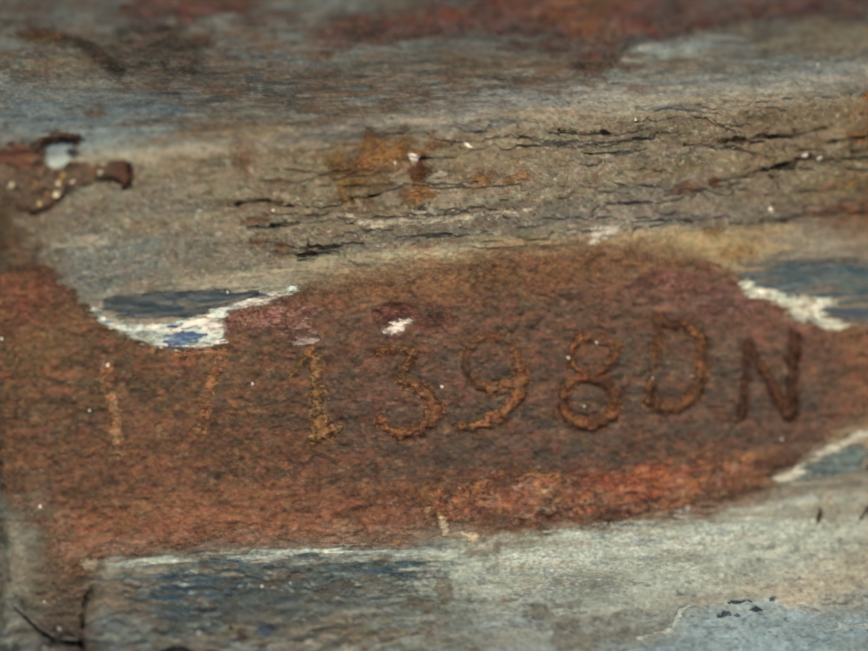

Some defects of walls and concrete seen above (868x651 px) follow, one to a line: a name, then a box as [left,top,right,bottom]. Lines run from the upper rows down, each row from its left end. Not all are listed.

rust [313,0,868,78]
peeling [92,286,297,351]
peeling [739,252,868,330]
rust [0,241,868,591]
crack [30,587,90,648]